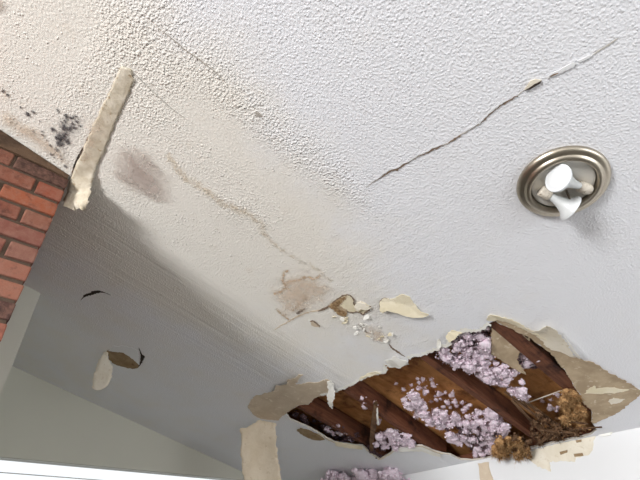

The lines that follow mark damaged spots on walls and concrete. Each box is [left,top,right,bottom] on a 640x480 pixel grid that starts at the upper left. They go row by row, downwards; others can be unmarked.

crack [367,38,618,187]
leakage [5,109,81,168]
crack [81,290,110,300]
peeling [437,330,462,349]
peeling [108,346,140,365]
peeling [384,356,408,369]
peeling [326,381,335,409]
peeling [335,441,363,450]
peeling [530,432,612,472]
peeling [478,462,493,480]